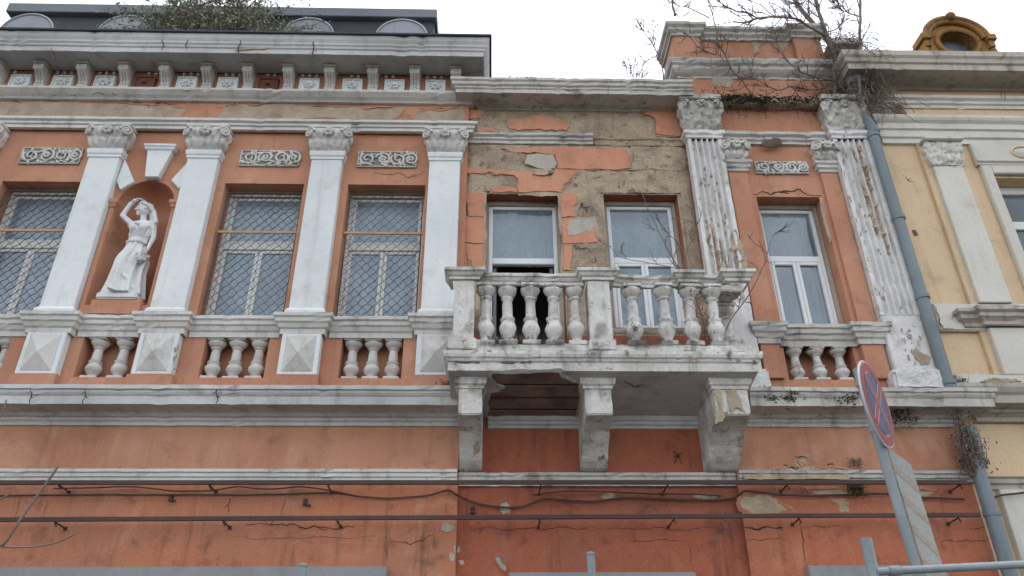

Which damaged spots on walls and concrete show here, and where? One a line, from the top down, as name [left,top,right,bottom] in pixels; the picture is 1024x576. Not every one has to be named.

flaking render [469,109,571,132]
flaking render [640,109,683,138]
flaking render [464,146,633,273]
peeling [700,147,748,271]
crack [753,188,822,196]
peeling [836,145,892,269]
peeling [901,328,930,365]
spalling [484,361,580,418]
crack [225,495,433,559]
crack [478,502,845,565]
flaking render [736,494,795,519]
peeling [744,457,853,513]